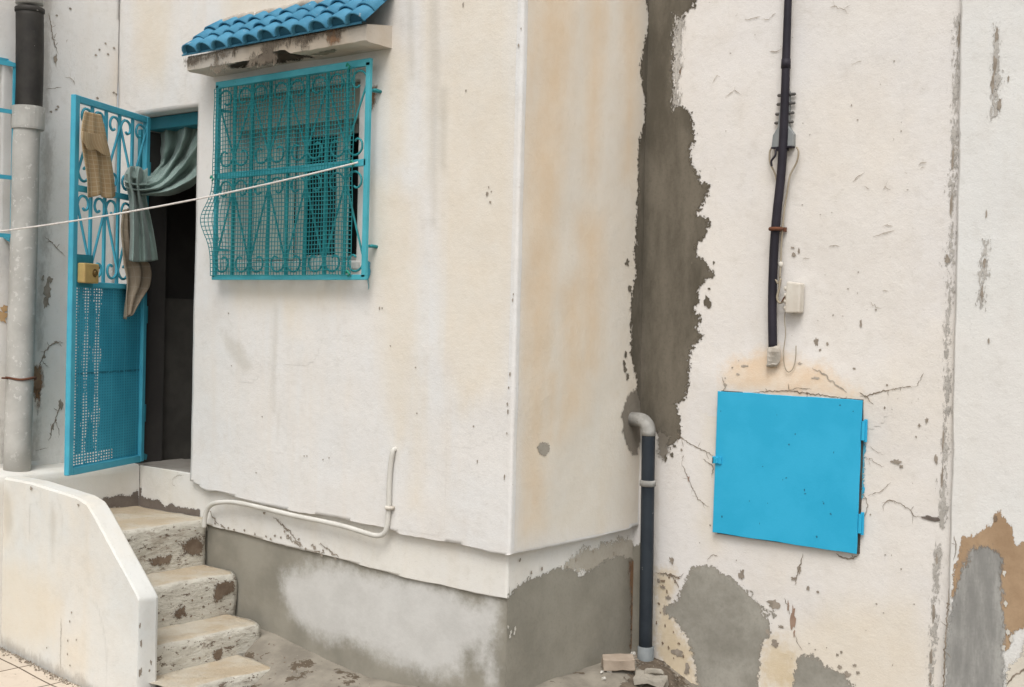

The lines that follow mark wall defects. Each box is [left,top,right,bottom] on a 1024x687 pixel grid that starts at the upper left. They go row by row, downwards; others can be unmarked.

spalling [227,49,336,69]
peeling [989,23,1009,119]
peeling [934,14,961,529]
crack [36,399,63,451]
crack [38,341,63,369]
crack [677,434,713,507]
crack [754,374,923,404]
crack [862,447,956,560]
peeling [162,580,236,621]
peeling [506,535,640,687]
flaking render [656,557,796,687]
peeling [924,509,1024,687]